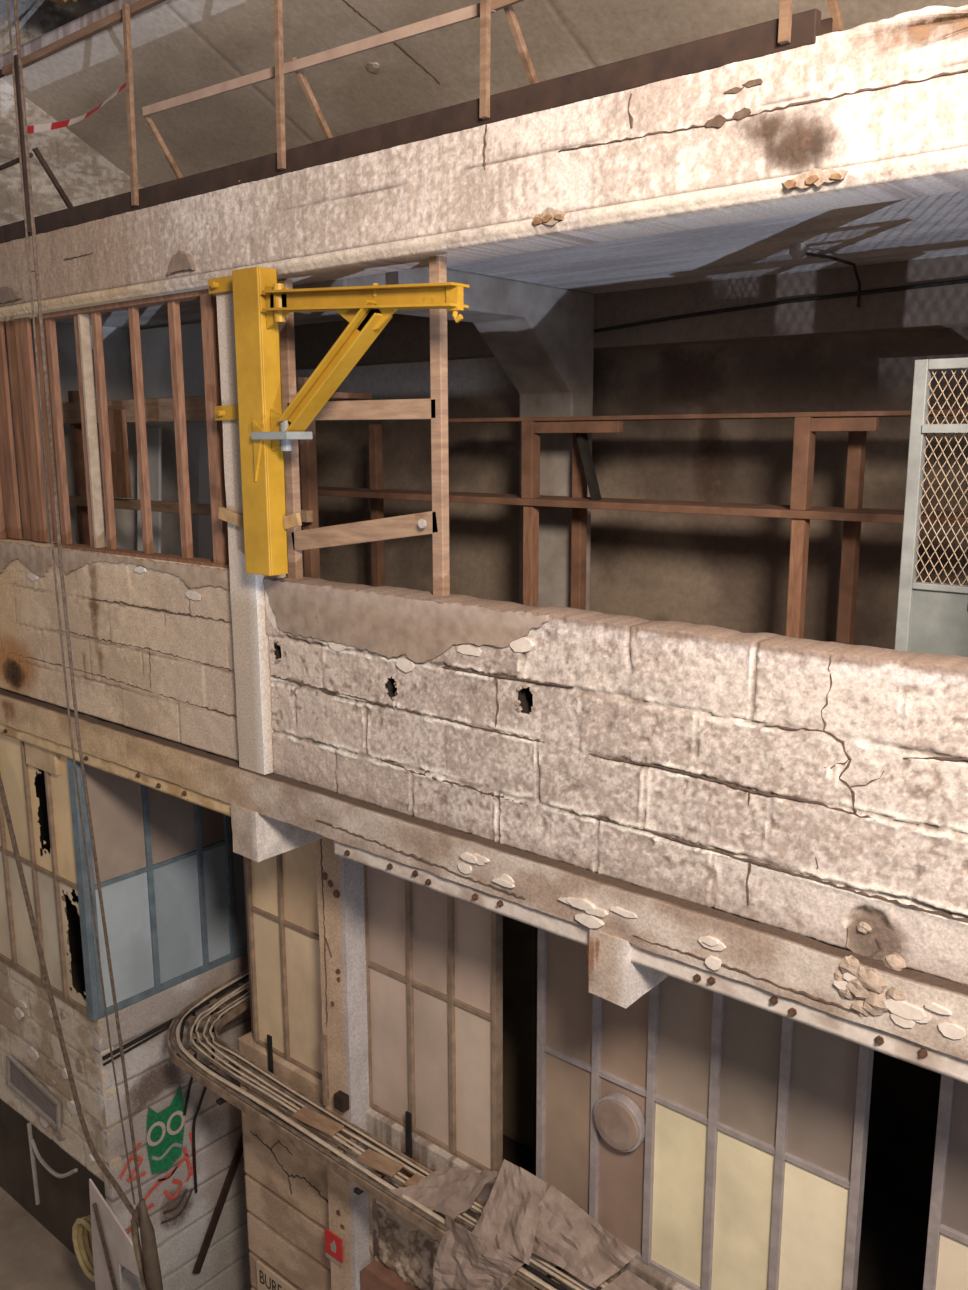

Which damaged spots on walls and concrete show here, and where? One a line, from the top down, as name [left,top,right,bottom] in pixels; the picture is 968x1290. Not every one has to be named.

crack [558,69,968,152]
crack [481,124,489,170]
leakage [750,111,835,166]
rust [0,642,31,686]
crack [589,655,968,821]
peeling [458,852,490,874]
peeling [492,874,515,888]
peeling [558,897,637,928]
peeling [698,935,726,970]
spalling [834,913,966,1039]
crack [250,1131,328,1203]